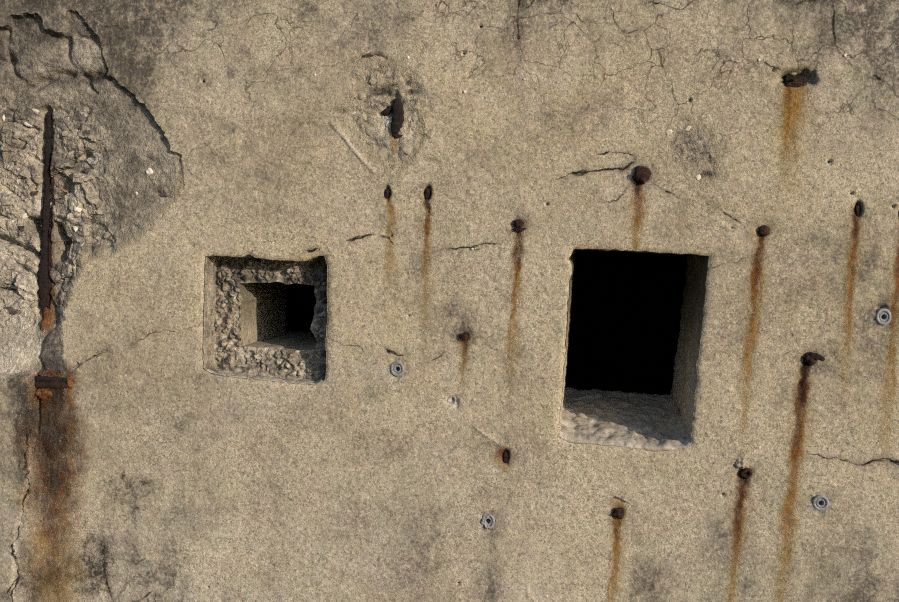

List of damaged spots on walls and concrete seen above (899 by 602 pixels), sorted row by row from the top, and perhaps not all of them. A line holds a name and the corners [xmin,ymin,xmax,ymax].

crack [798,0,852,65]
rust [37,111,55,331]
spalling [0,10,184,378]
spalling [341,56,429,175]
rust [509,227,523,345]
crack [559,151,635,179]
rust [744,235,764,378]
crack [7,409,34,602]
rust [20,369,82,602]
rust [730,477,749,601]
rust [782,360,811,566]
crack [814,454,899,466]